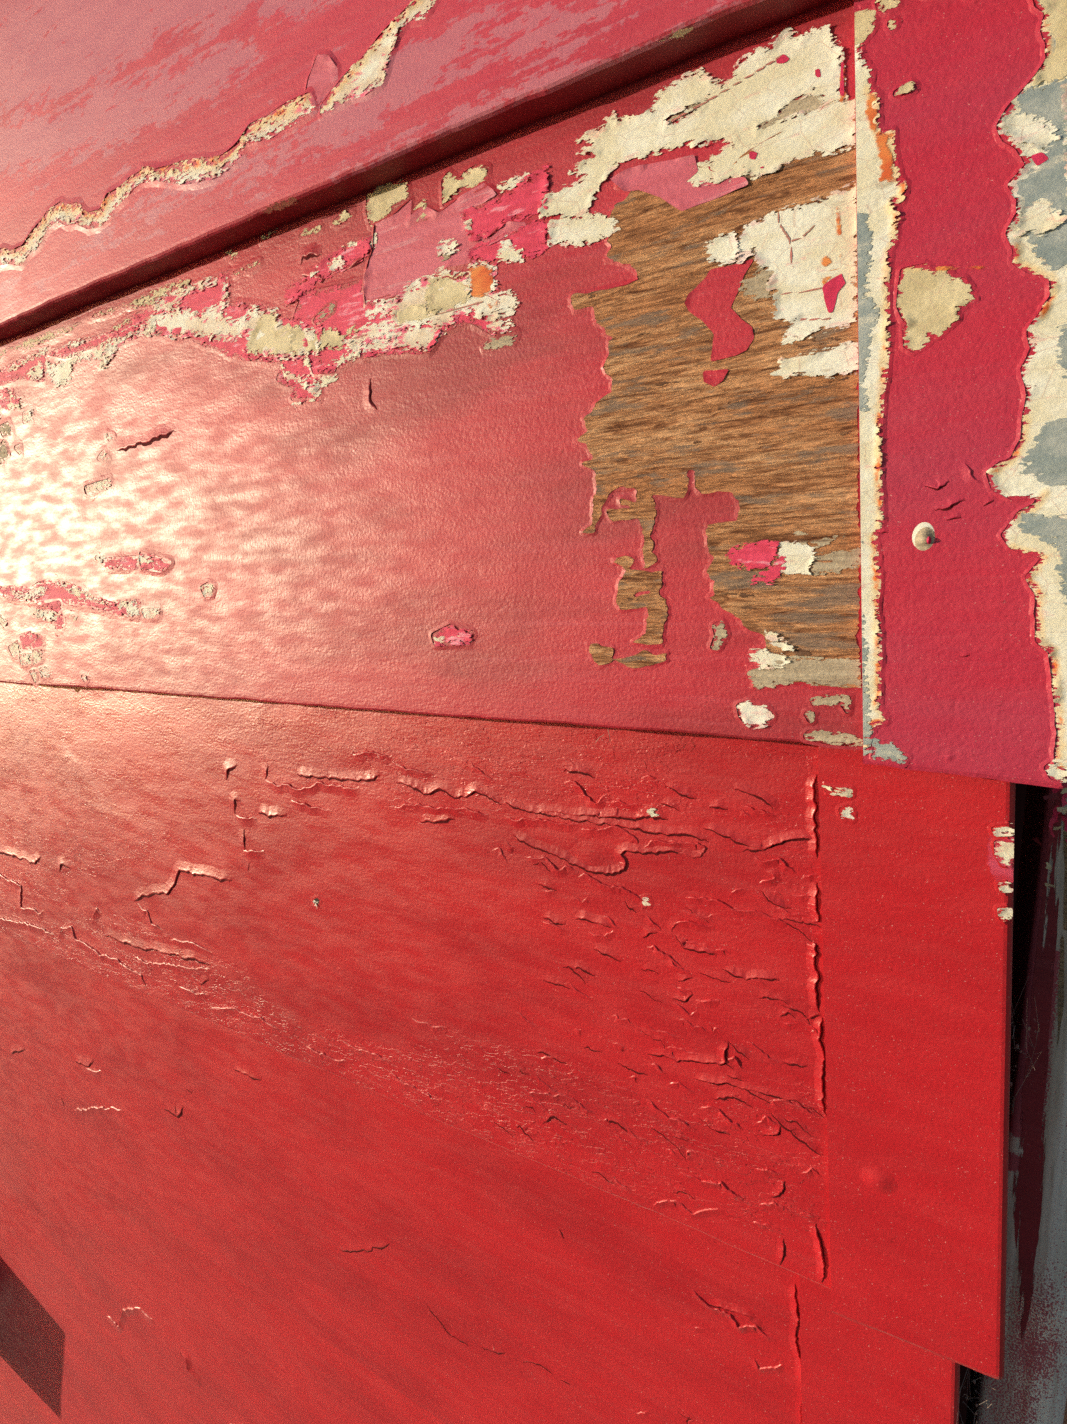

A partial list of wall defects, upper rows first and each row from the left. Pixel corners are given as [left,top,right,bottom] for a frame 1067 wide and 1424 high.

crack [0,750,827,1424]
peeling [0,0,983,768]
peeling [639,893,654,909]
peeling [645,803,663,821]
peeling [822,781,858,825]
peeling [981,0,1067,1341]